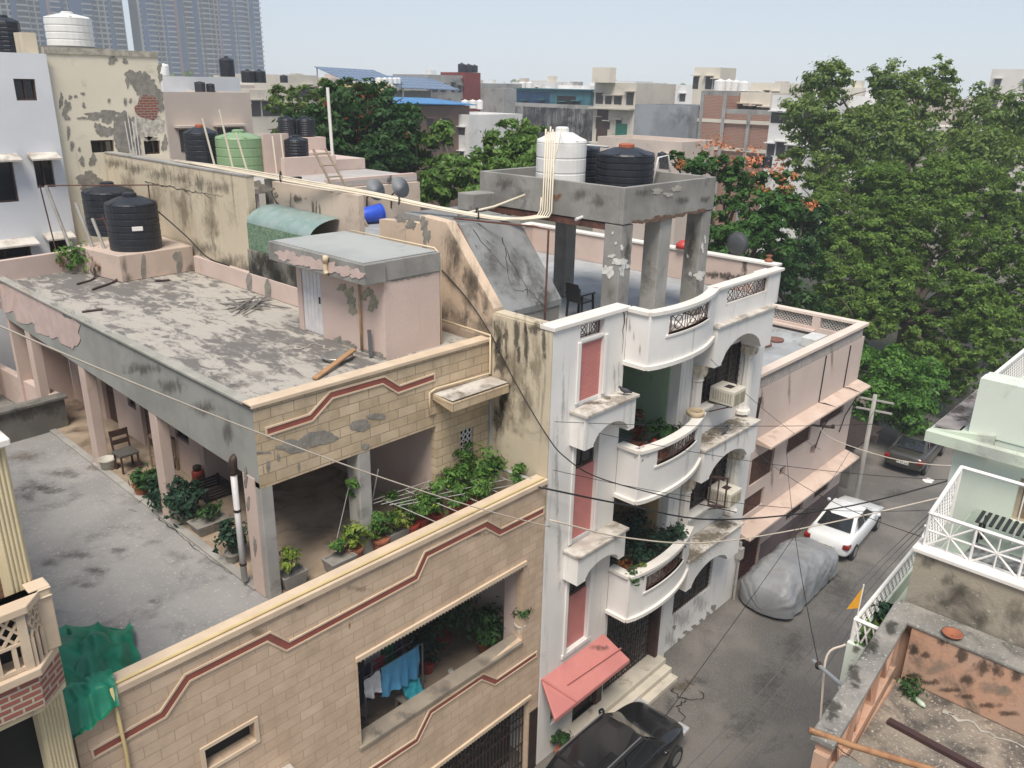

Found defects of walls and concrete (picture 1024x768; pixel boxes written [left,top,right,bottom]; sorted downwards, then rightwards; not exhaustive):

spalling [59,56,168,190]
peeling [275,250,378,316]
crack [473,229,547,310]
peeling [602,232,630,279]
peeling [0,284,80,349]
leakage [494,322,545,374]
peeling [275,430,338,453]
peeling [349,413,386,450]
leakage [494,385,510,431]
leakage [910,646,1021,715]